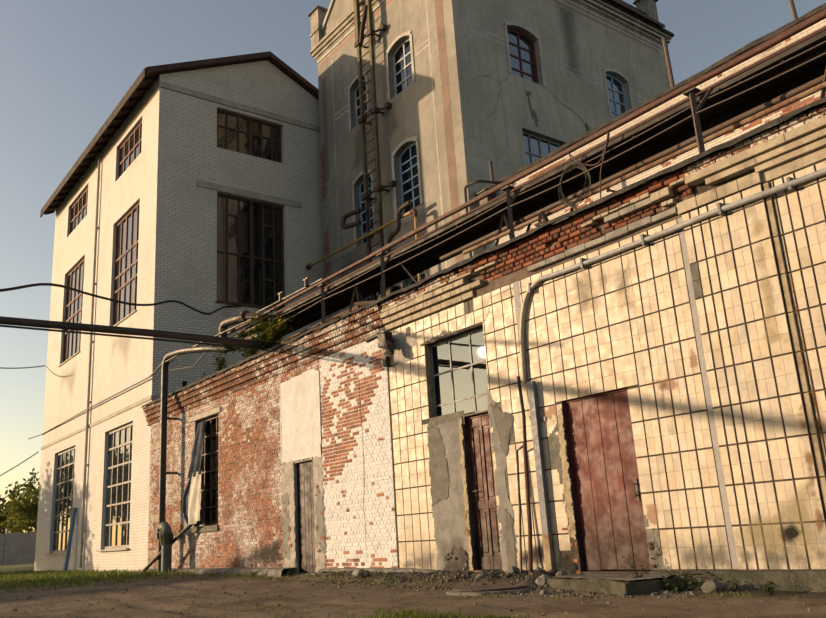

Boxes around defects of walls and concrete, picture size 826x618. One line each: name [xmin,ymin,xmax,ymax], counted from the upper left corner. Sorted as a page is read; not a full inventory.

crack [550,93,590,132]
rust [779,271,806,369]
peeling [148,409,209,568]
peeling [219,375,282,453]
flaking render [270,461,296,572]
peeling [312,350,398,577]
spalling [443,544,470,571]
rust [802,386,821,483]